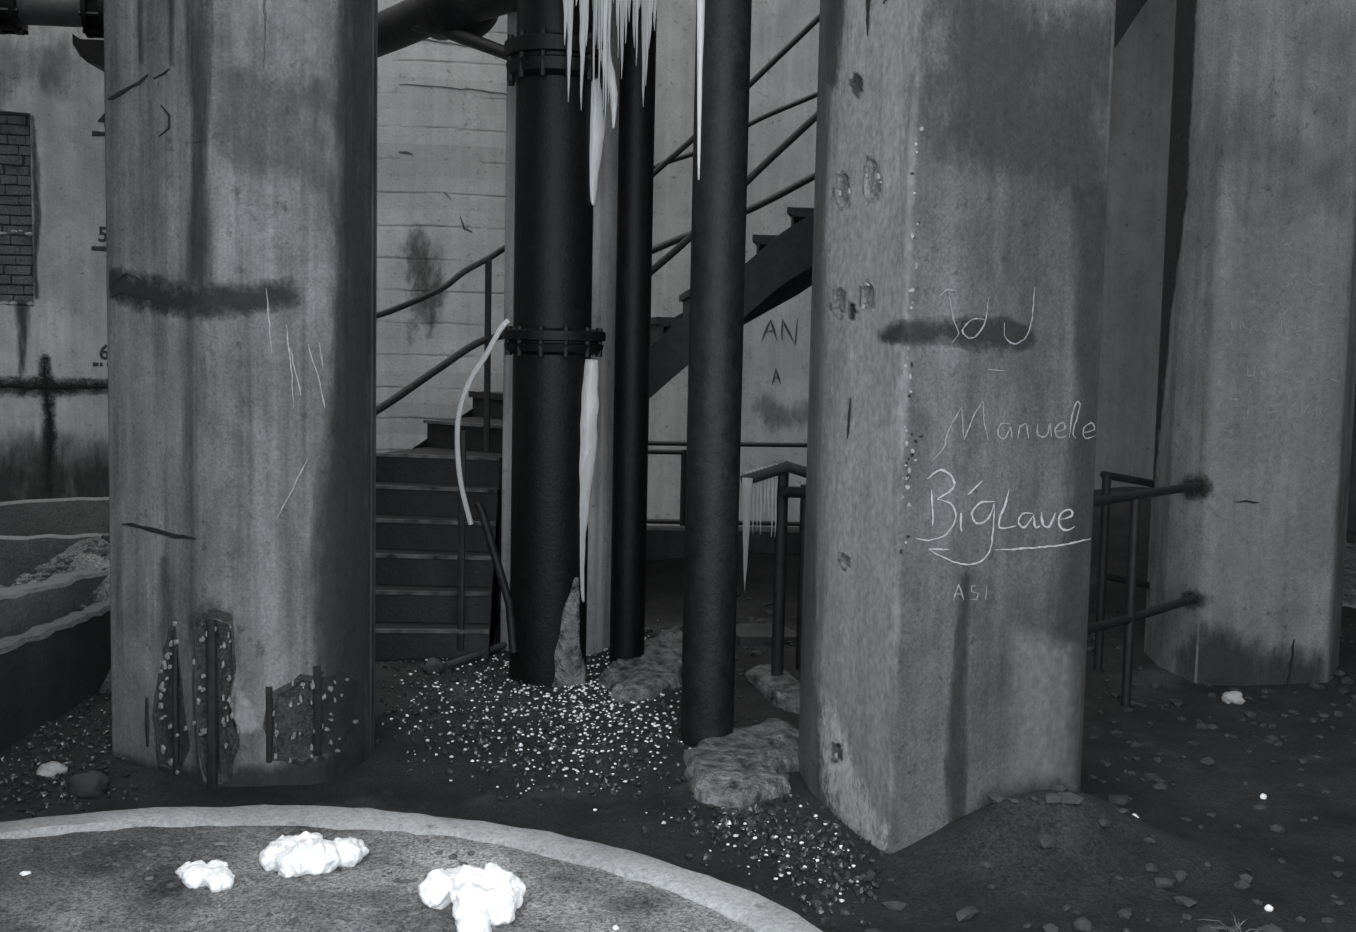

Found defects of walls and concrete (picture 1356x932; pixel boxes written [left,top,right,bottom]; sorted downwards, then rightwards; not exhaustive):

crack [261,0,269,69]
spalling [852,73,864,96]
spalling [834,156,882,209]
leakage [408,234,442,325]
spalling [832,280,875,320]
leakage [120,0,376,787]
spalling [145,608,349,788]